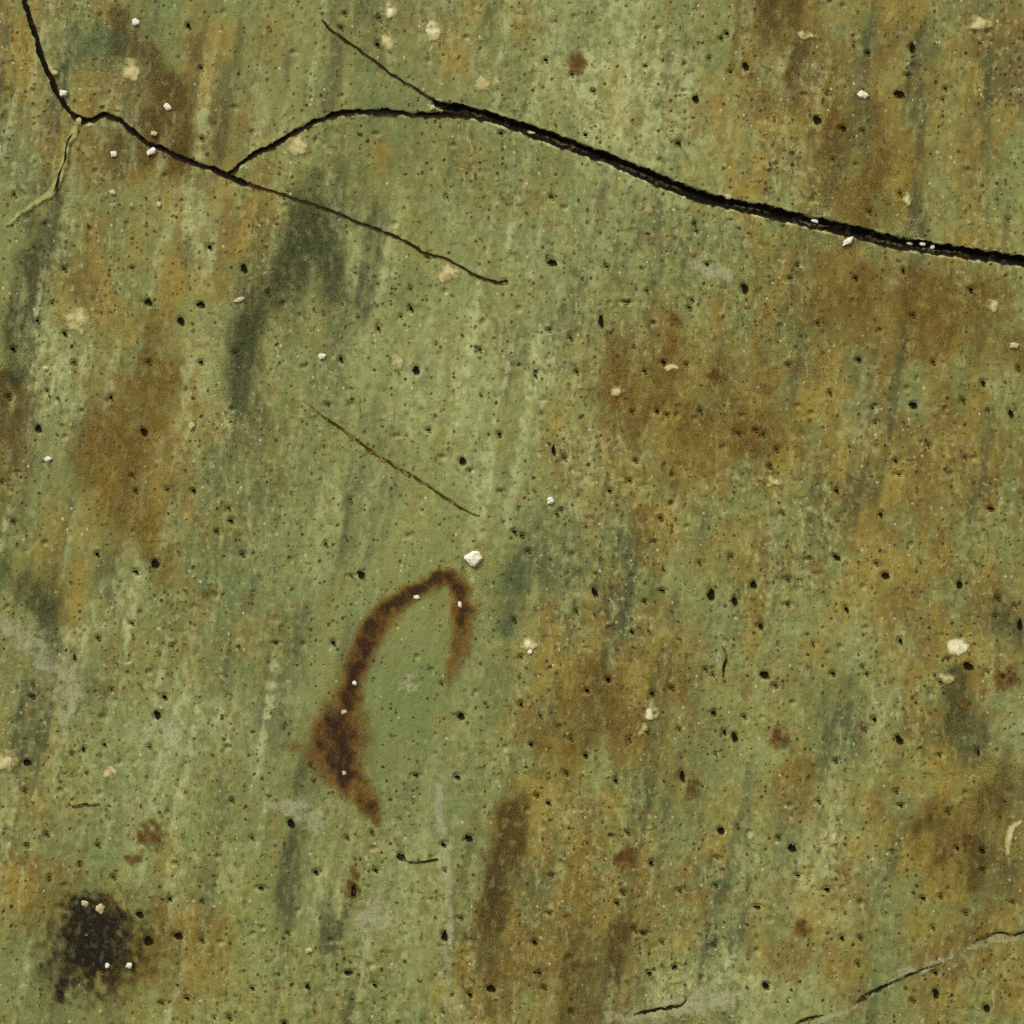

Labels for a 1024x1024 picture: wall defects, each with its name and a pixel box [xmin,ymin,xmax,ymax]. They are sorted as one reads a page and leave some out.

crack [7,0,1024,284]
crack [308,403,480,516]
rust [296,568,475,825]
damp [38,889,148,1007]